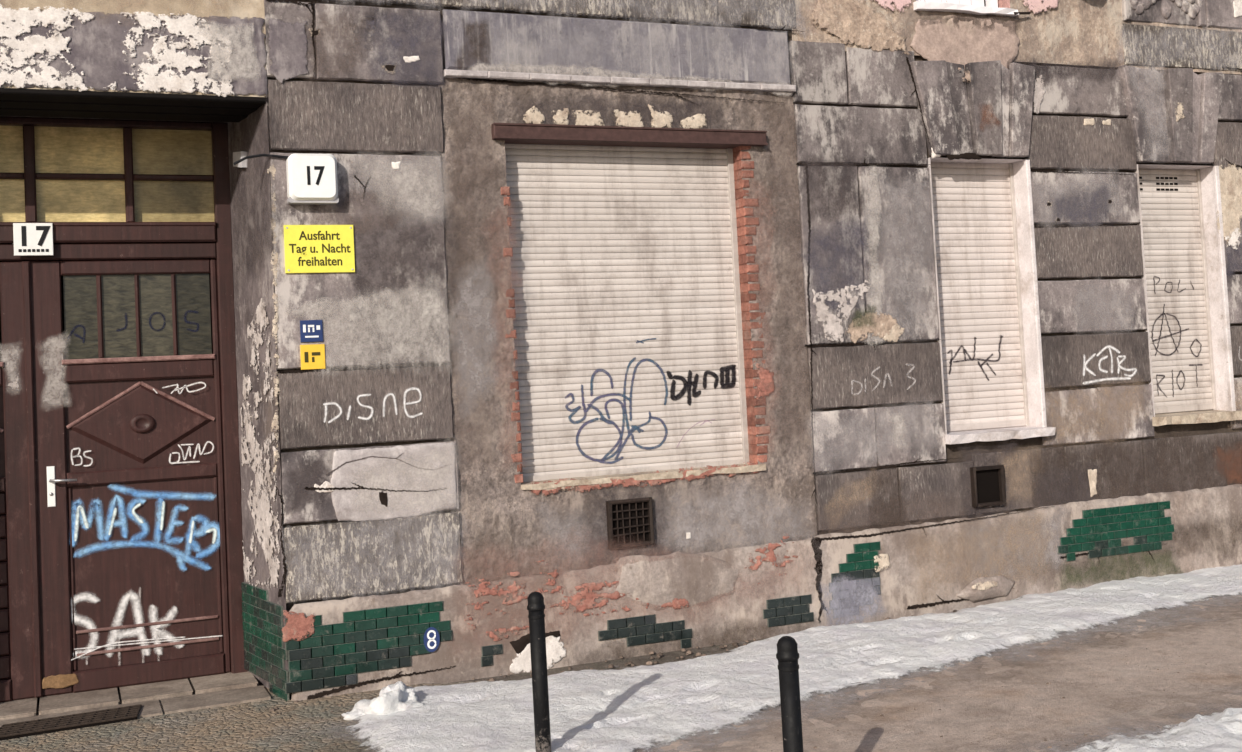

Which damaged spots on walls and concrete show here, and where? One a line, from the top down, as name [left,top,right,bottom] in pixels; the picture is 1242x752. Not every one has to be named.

peeling [0,4,234,97]
flaking render [523,104,707,129]
flaking render [1216,163,1242,250]
peeling [240,164,281,589]
flaking render [505,146,775,496]
peeling [812,280,904,343]
crack [796,57,1054,622]
flaking render [465,560,689,674]